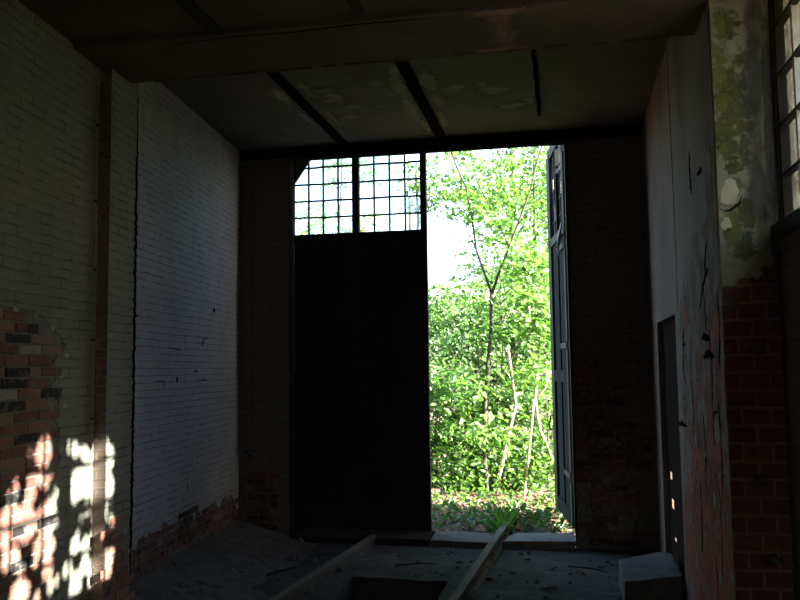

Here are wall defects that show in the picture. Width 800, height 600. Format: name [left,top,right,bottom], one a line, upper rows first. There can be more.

crack [666,46,702,307]
leakage [743,5,778,226]
peeling [0,306,70,600]
crack [129,95,139,592]
peeling [100,470,280,600]
crack [679,245,723,600]